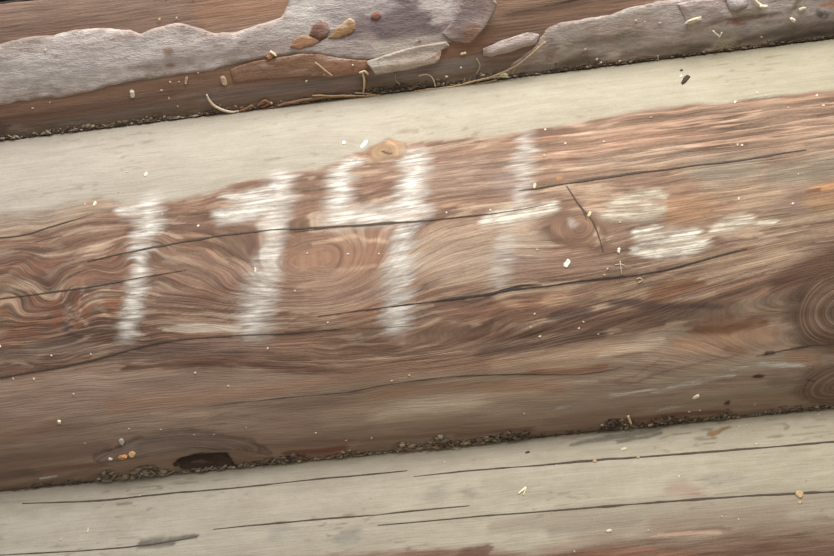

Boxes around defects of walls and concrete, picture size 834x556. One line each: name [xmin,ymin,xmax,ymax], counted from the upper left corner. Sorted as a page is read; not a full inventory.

peeling [230,18,369,83]
peeling [443,0,497,43]
crack [87,149,806,262]
crack [0,249,745,379]
crack [213,367,622,406]
crack [22,441,834,504]
crack [217,491,834,529]
crack [3,536,197,555]